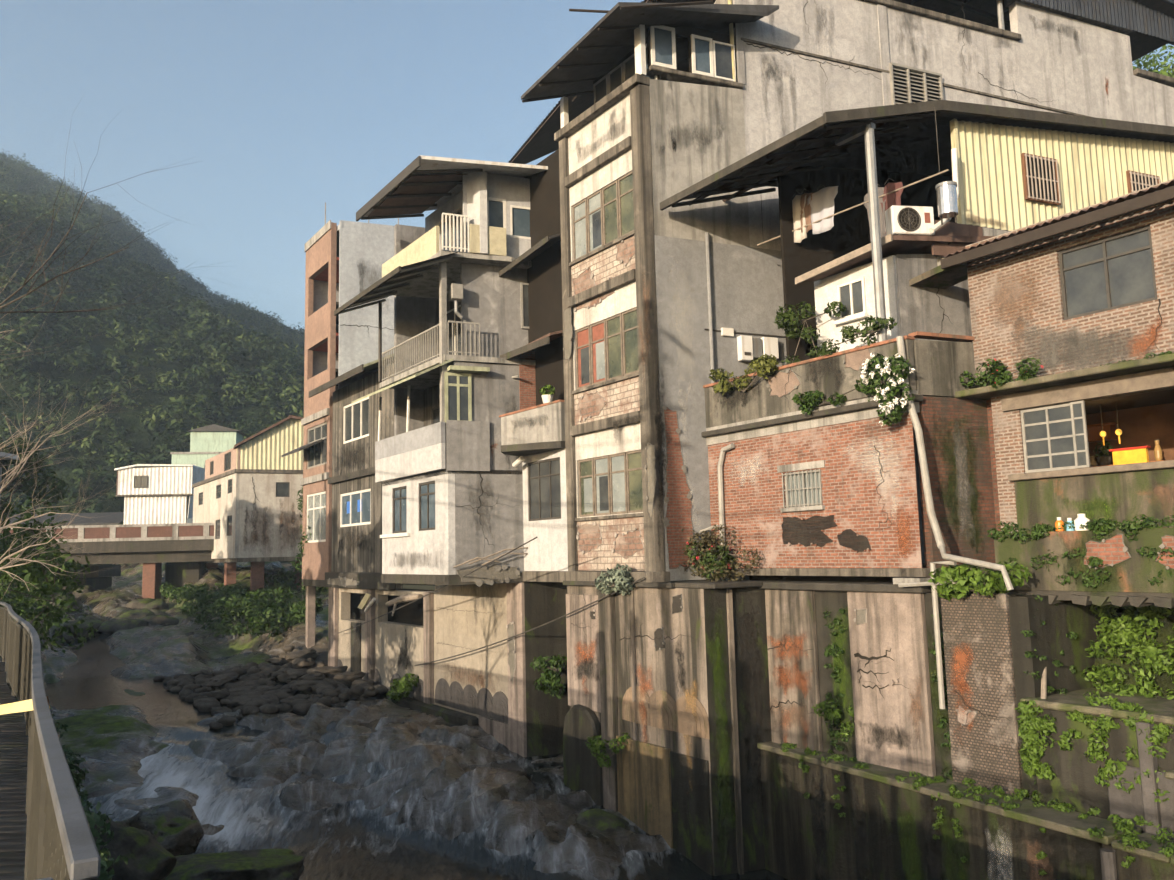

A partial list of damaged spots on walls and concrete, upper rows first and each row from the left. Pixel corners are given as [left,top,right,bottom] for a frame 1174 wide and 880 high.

crack [958,2,1059,102]
peeling [616,235,635,266]
peeling [563,267,615,361]
peeling [766,369,801,398]
peeling [576,405,694,569]
crack [874,445,892,547]
spalling [781,515,872,553]
spalling [1084,534,1131,570]
spalling [1155,535,1174,570]
crack [854,649,909,698]
corrosion [954,647,972,728]